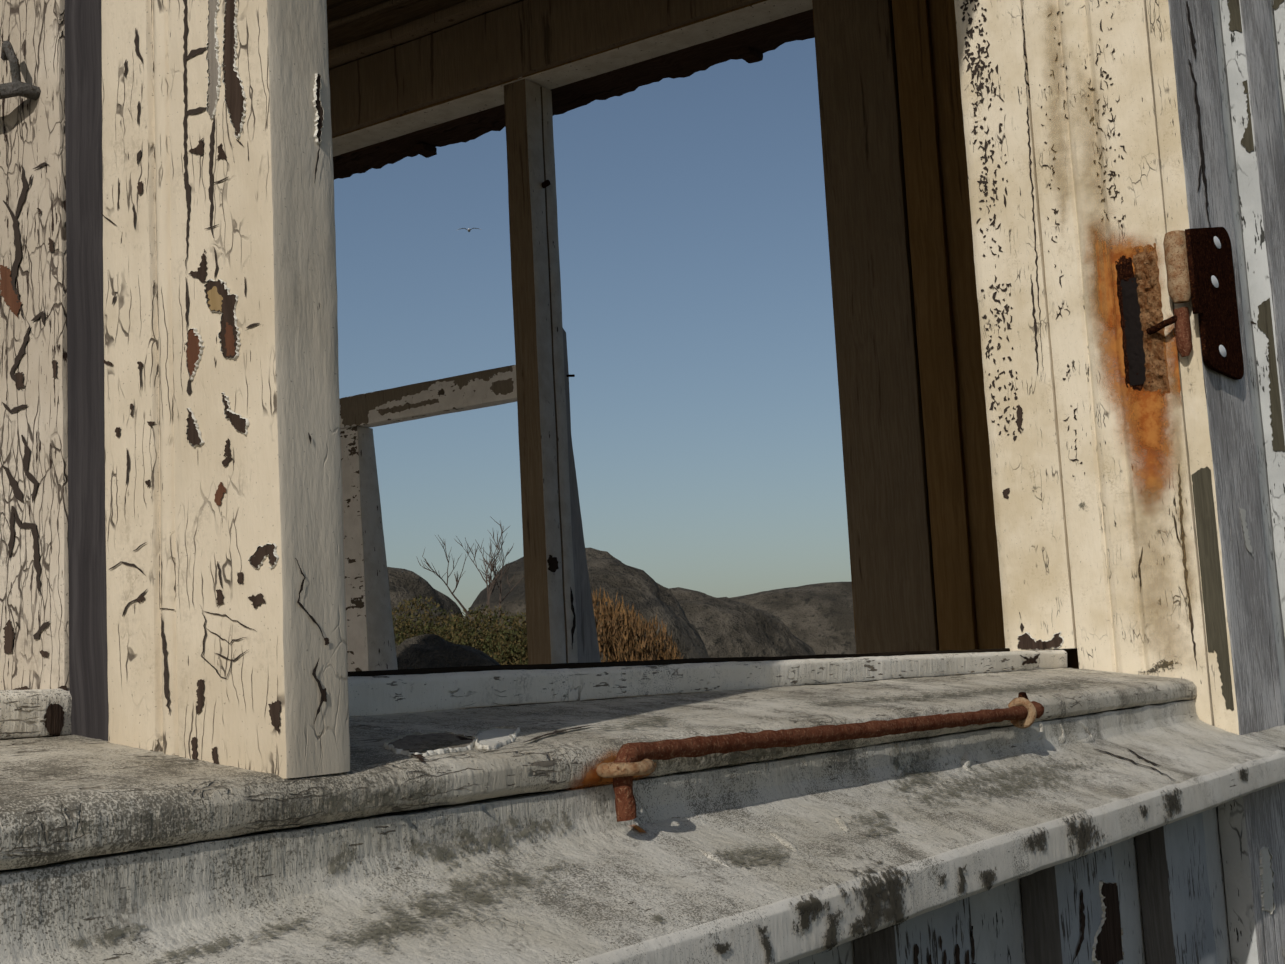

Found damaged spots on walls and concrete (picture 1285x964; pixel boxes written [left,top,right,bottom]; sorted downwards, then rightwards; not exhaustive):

peeling [185,0,260,448]
crack [0,162,57,593]
crack [103,359,159,487]
rust [1090,228,1181,503]
crack [109,543,256,713]
crack [295,558,329,724]
peeling [1191,466,1234,711]
peeling [383,725,590,762]
rust [577,753,617,788]
peeling [914,926,976,964]
peeling [1073,880,1124,964]